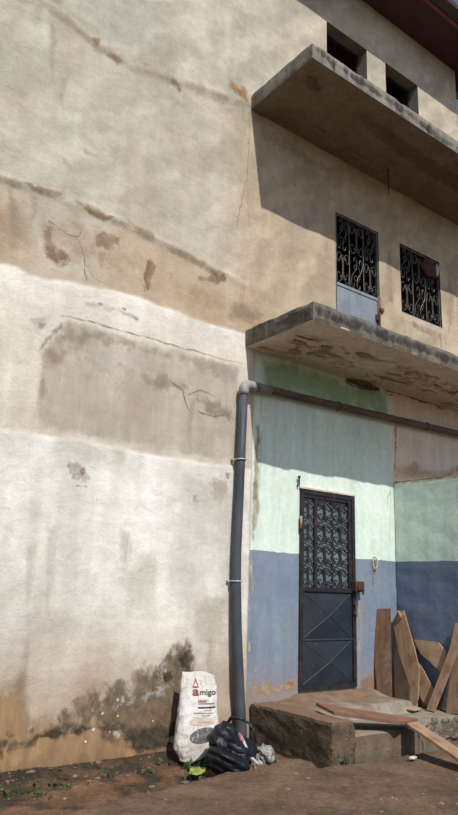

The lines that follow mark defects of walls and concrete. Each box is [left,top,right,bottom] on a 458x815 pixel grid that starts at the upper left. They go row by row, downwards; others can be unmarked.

water stain [96,233,118,247]
crack [61,315,230,361]
peeling [284,336,458,408]
peeling [252,666,295,698]
water stain [0,642,194,772]